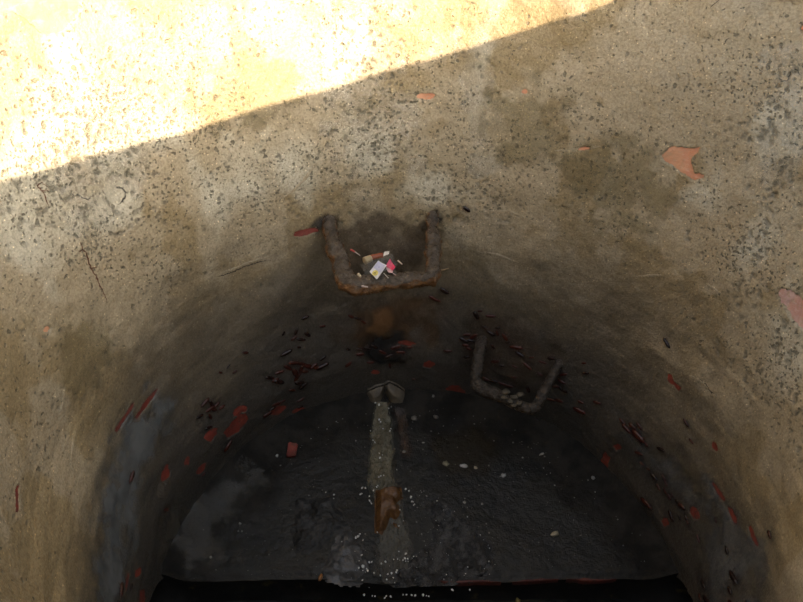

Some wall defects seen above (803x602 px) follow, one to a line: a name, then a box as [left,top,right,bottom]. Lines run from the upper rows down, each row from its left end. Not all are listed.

flaking render [662,146,704,180]
crack [79,239,107,300]
flaking render [779,289,803,328]
leakage [96,400,175,602]